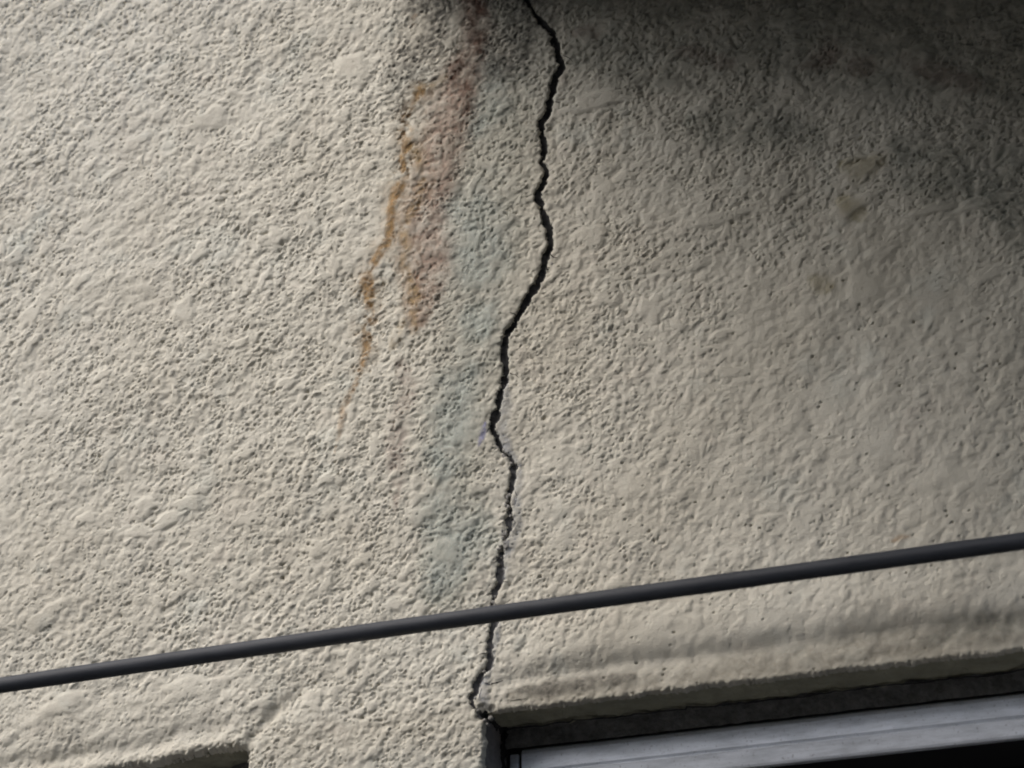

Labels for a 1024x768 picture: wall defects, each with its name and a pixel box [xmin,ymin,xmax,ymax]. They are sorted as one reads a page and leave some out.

rust [372,144,411,261]
crack [468,0,1024,768]